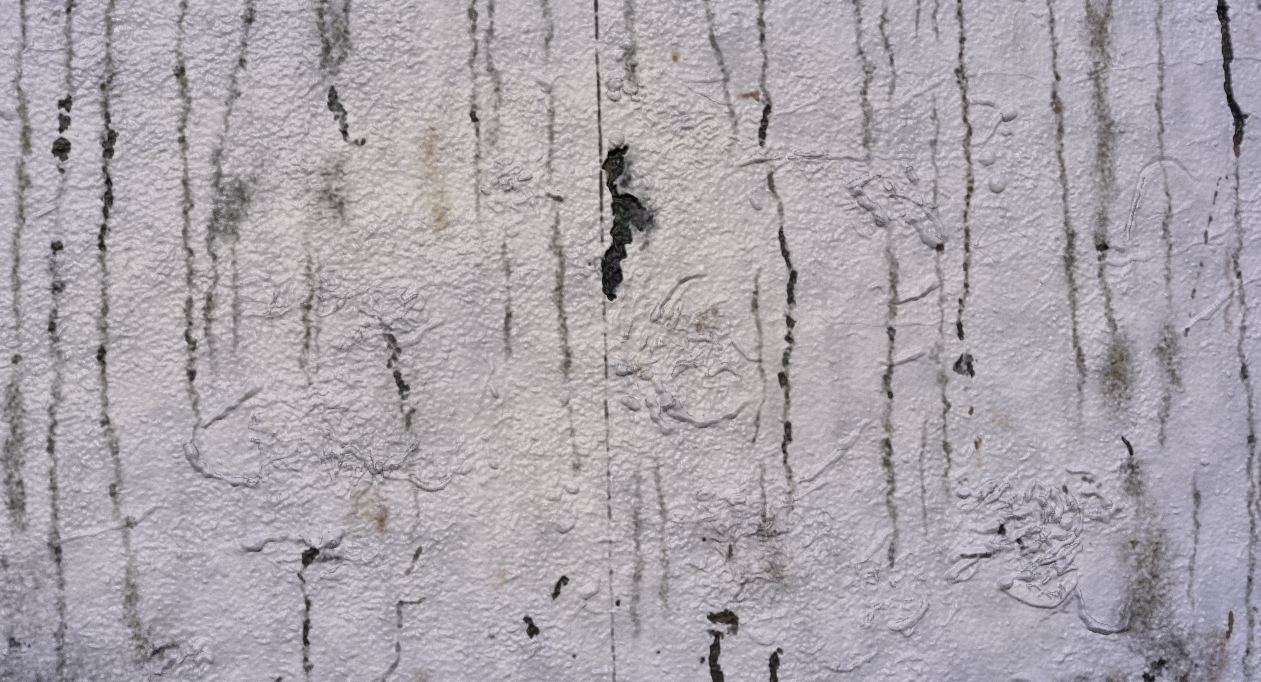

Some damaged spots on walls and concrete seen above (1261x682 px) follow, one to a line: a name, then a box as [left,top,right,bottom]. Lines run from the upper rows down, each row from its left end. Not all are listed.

damp [52,0,73,173]
damp [98,0,119,272]
damp [174,61,250,410]
damp [327,86,365,145]
peeling [589,146,656,301]
damp [759,56,772,146]
damp [768,173,798,469]
damp [941,0,977,476]
crack [1186,0,1248,336]
damp [298,547,341,581]
damp [701,609,739,682]
damp [769,648,783,682]